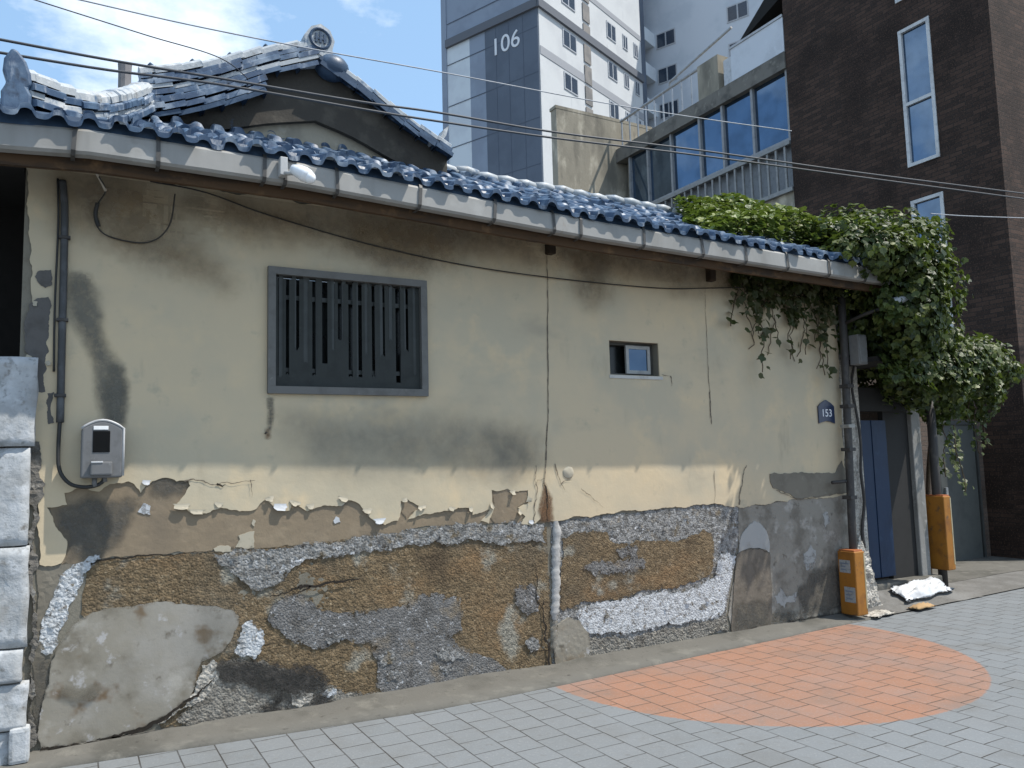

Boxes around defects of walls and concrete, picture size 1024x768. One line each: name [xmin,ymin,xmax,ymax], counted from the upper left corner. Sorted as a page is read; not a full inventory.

peeling [24,270,54,424]
leakage [70,275,125,423]
crack [534,255,549,522]
crack [184,479,255,491]
corrosion [539,487,553,522]
spalling [32,478,849,743]